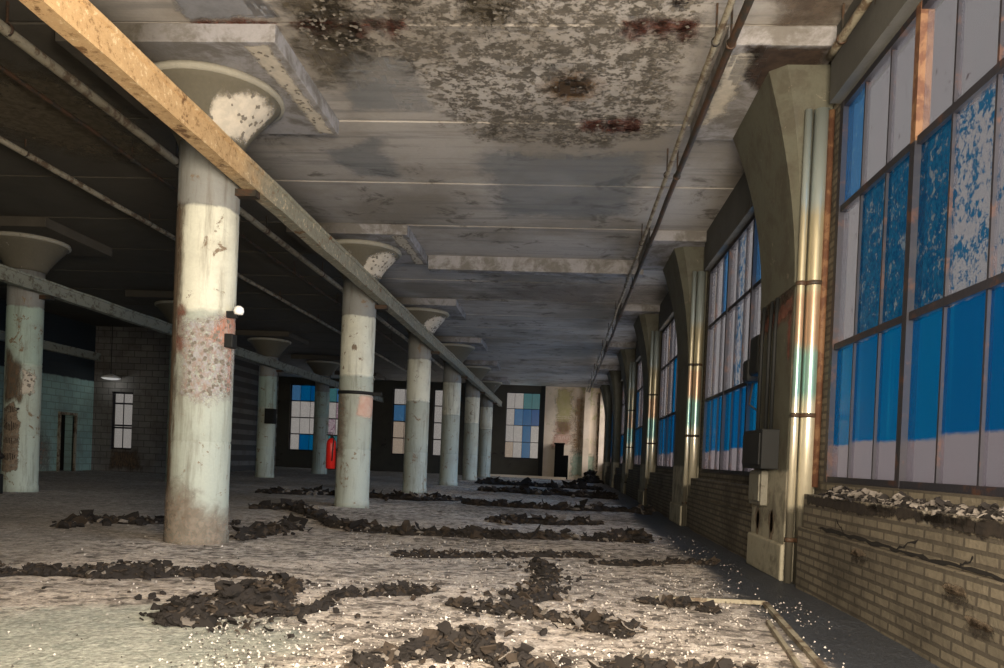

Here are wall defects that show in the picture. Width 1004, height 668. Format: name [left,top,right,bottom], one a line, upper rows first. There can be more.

water stain [278,0,371,75]
corrosion [291,19,406,40]
water stain [459,0,517,26]
corrosion [622,19,698,42]
peeling [208,90,272,141]
peeling [246,45,332,134]
peeling [297,0,702,149]
water stain [547,70,597,103]
corrosion [579,118,643,133]
corrosion [207,318,235,391]
spalling [1,402,21,472]
crack [819,519,1004,583]